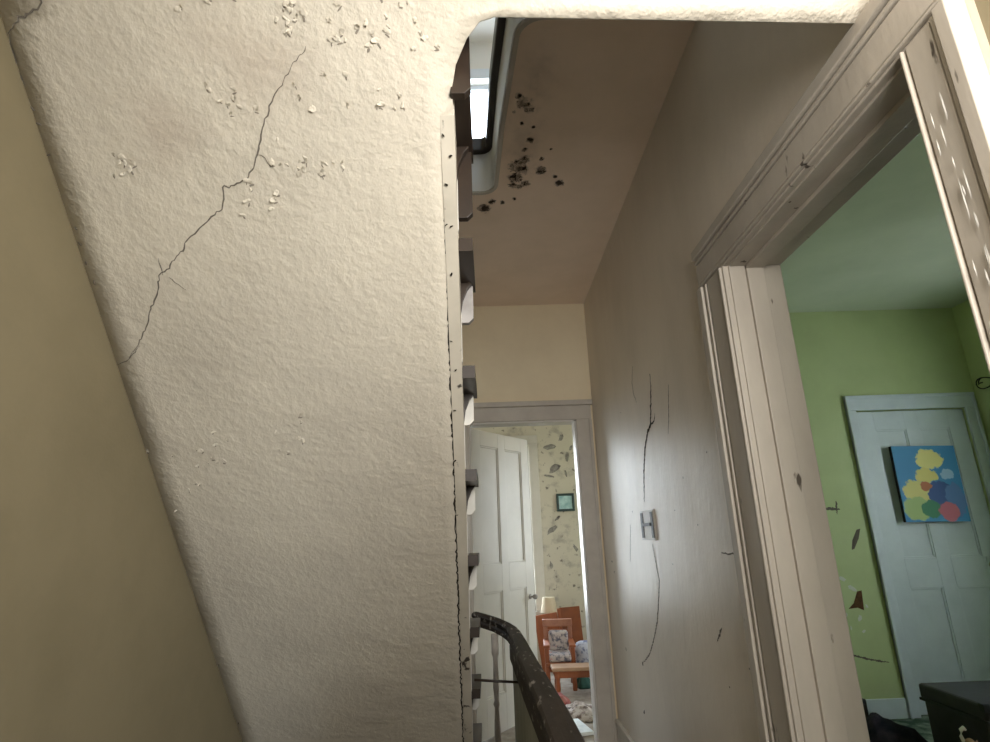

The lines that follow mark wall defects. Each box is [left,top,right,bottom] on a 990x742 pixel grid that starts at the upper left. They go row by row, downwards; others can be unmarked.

crack [8,0,42,85]
crack [118,46,306,365]
damp [479,94,564,211]
crack [632,366,669,502]
crack [630,525,660,662]